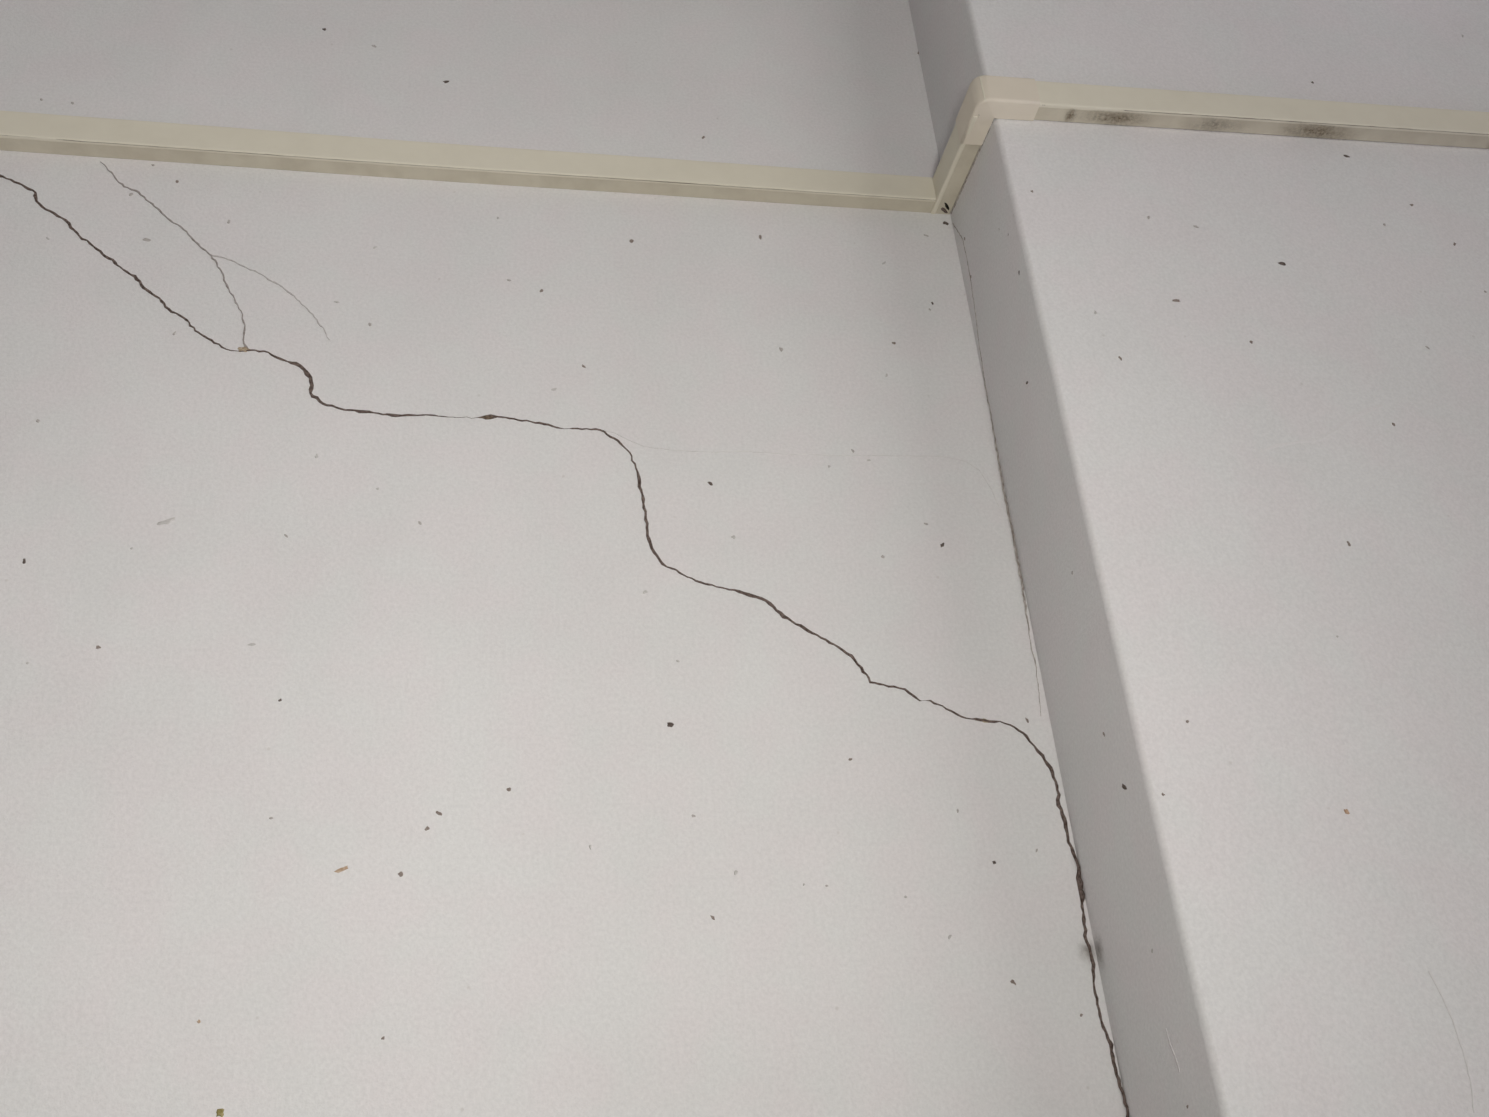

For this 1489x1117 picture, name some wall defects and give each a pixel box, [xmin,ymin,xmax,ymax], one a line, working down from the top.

crack [0,122,1129,1117]